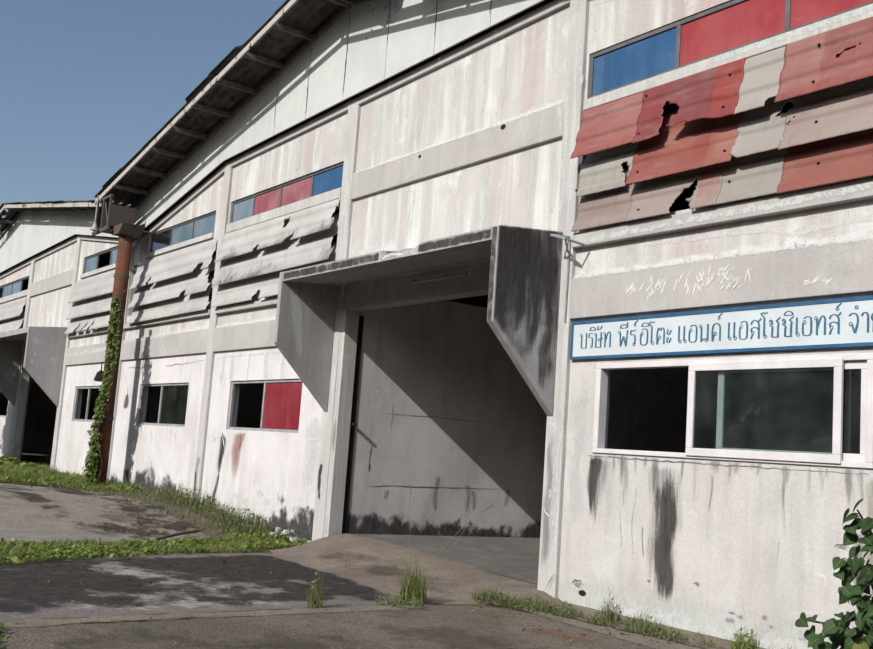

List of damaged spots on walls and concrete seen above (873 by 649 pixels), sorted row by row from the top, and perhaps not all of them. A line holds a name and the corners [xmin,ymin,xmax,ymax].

peeling [573,180,873,279]
water stain [283,253,379,280]
water stain [418,170,562,383]
water stain [110,467,175,495]
water stain [588,457,601,510]
water stain [262,499,314,541]
water stain [347,513,541,538]
water stain [654,480,676,597]